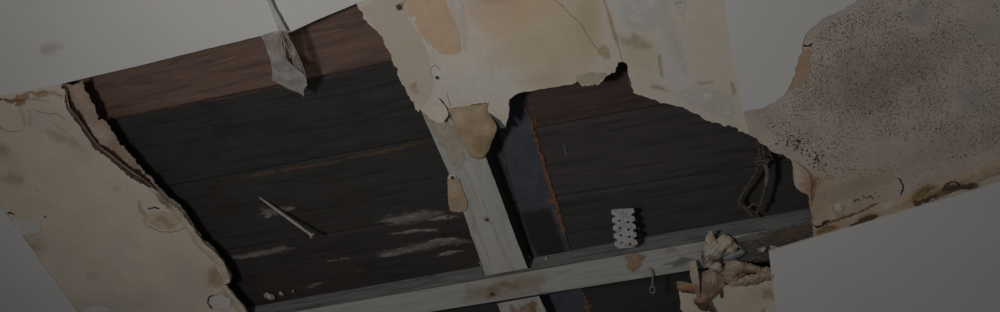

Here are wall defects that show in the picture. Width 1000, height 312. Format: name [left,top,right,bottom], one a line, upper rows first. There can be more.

peeling [363,0,461,107]
water stain [576,72,607,84]
water stain [754,0,1000,206]
peeling [790,159,813,199]
water stain [229,246,288,259]
water stain [726,222,813,262]